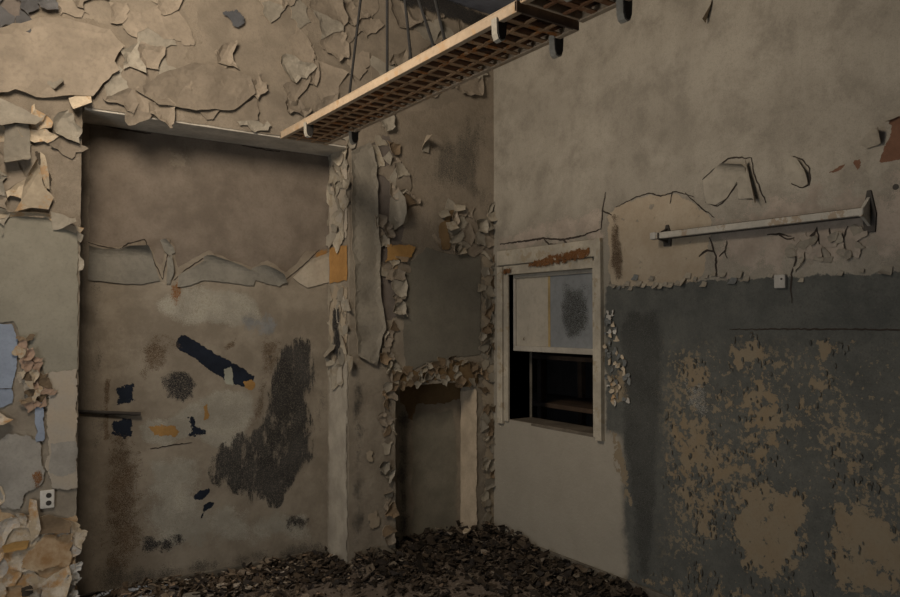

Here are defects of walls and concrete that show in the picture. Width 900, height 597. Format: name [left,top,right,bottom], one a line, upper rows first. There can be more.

peeling [11,334,57,413]
flaking render [0,0,479,389]
corrosion [528,248,590,267]
crack [500,156,766,277]
spalling [366,71,900,597]
water stain [620,309,665,579]